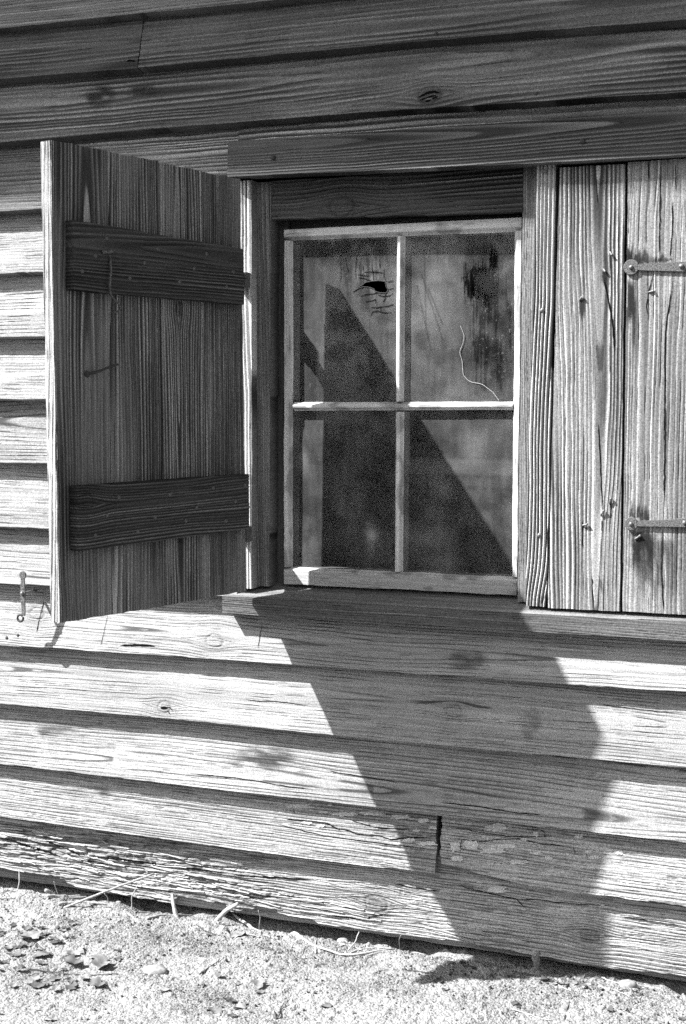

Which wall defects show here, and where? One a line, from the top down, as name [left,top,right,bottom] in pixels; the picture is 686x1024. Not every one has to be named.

crack [189,770,588,859]
crack [6,839,309,902]
crack [332,913,385,921]